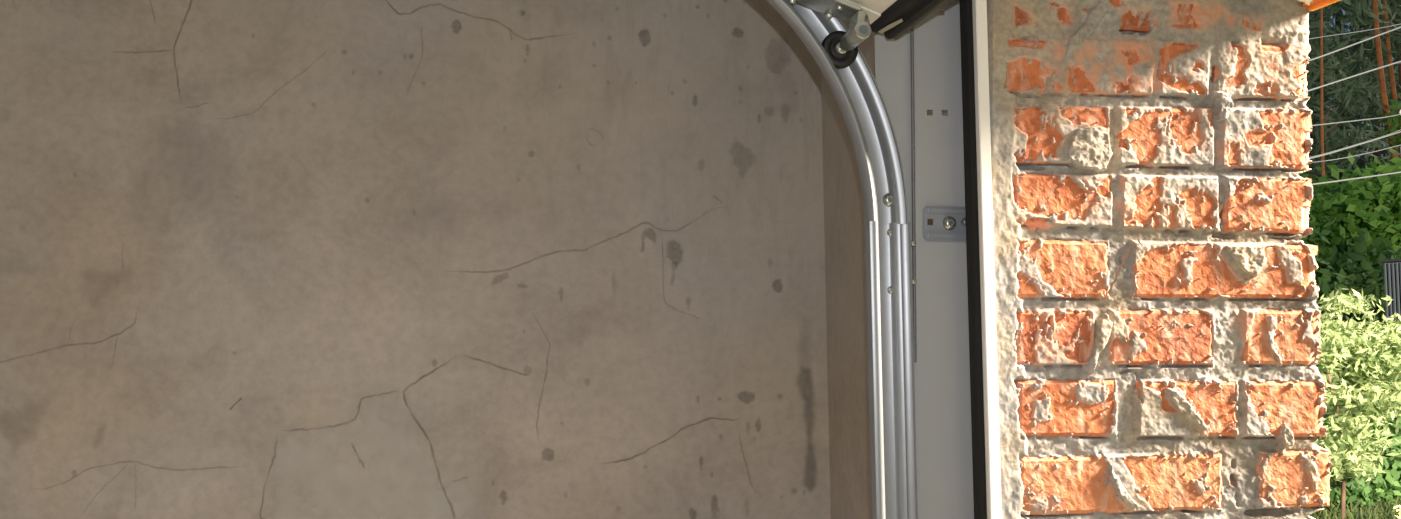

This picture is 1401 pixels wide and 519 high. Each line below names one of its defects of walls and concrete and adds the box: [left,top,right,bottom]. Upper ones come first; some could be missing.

crack [1108,239,1142,297]